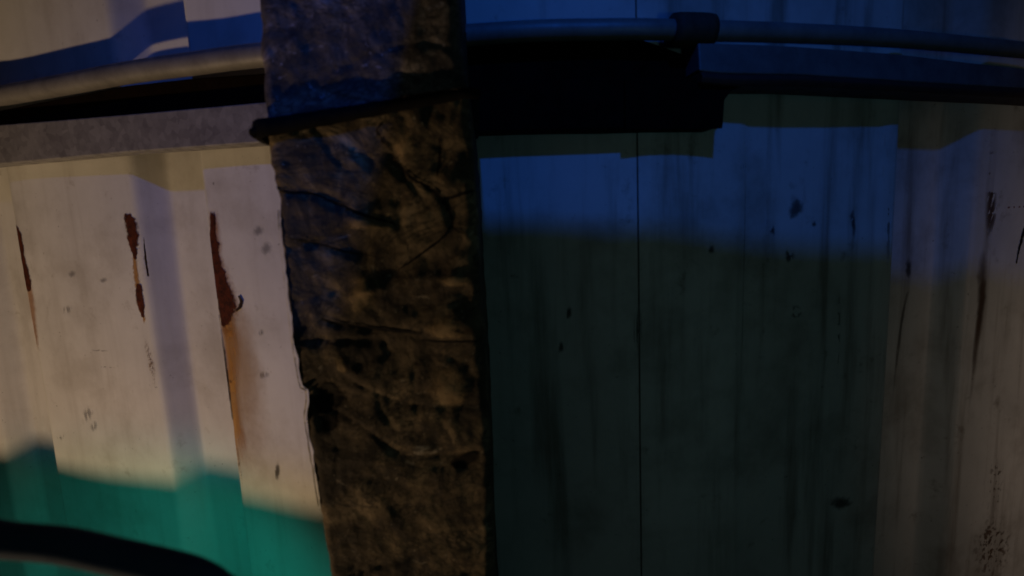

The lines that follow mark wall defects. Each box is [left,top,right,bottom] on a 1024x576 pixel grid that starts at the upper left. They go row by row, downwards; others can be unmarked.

corrosion [16,226,36,338]
corrosion [124,214,145,322]
corrosion [210,213,243,465]